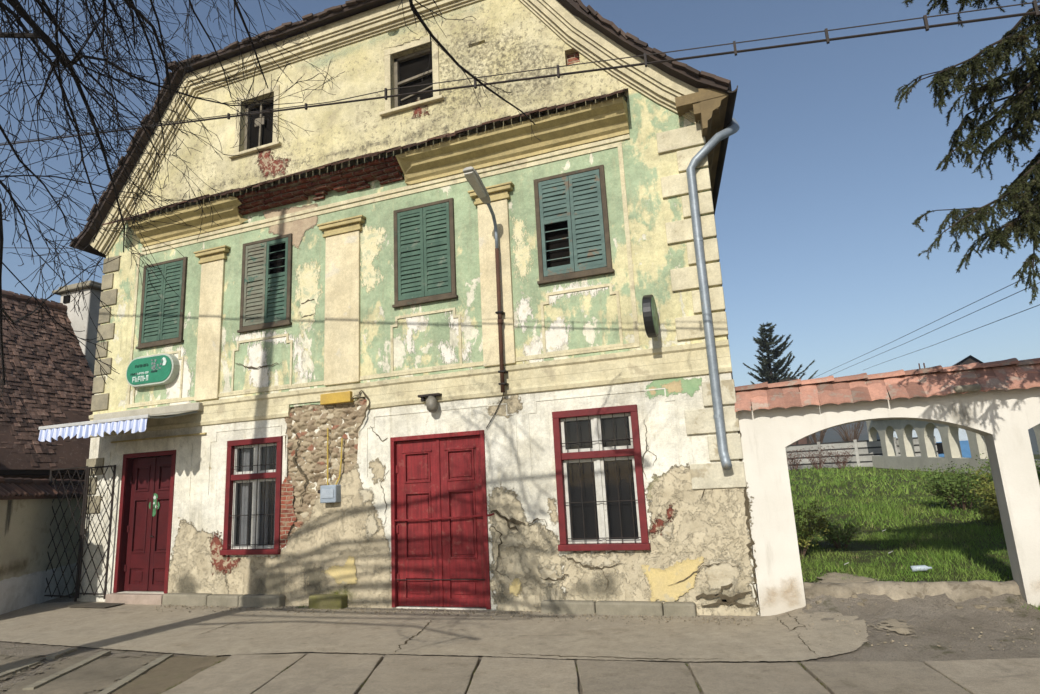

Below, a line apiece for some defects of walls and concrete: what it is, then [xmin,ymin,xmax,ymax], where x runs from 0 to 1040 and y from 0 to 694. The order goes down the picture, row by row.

peeling [233,258,323,392]
peeling [403,311,429,354]
peeling [437,308,472,369]
peeling [510,216,614,363]
flaking render [168,458,392,608]
crack [491,509,547,580]
crack [540,555,624,591]
flaking render [488,460,760,616]
crack [667,487,758,607]